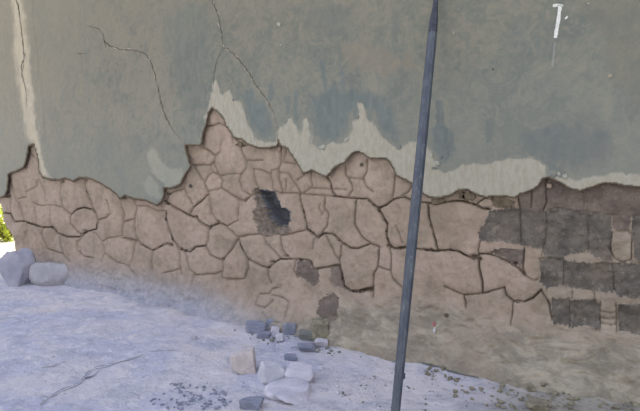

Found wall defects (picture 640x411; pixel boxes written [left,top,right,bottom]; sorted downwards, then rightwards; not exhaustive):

crack [16,0,27,104]
crack [86,25,184,143]
crack [212,0,278,144]
crack [5,191,97,238]
crack [140,201,204,252]
flaking render [0,76,417,362]
crack [341,275,373,293]
crack [331,187,494,260]
flaking render [405,142,640,404]